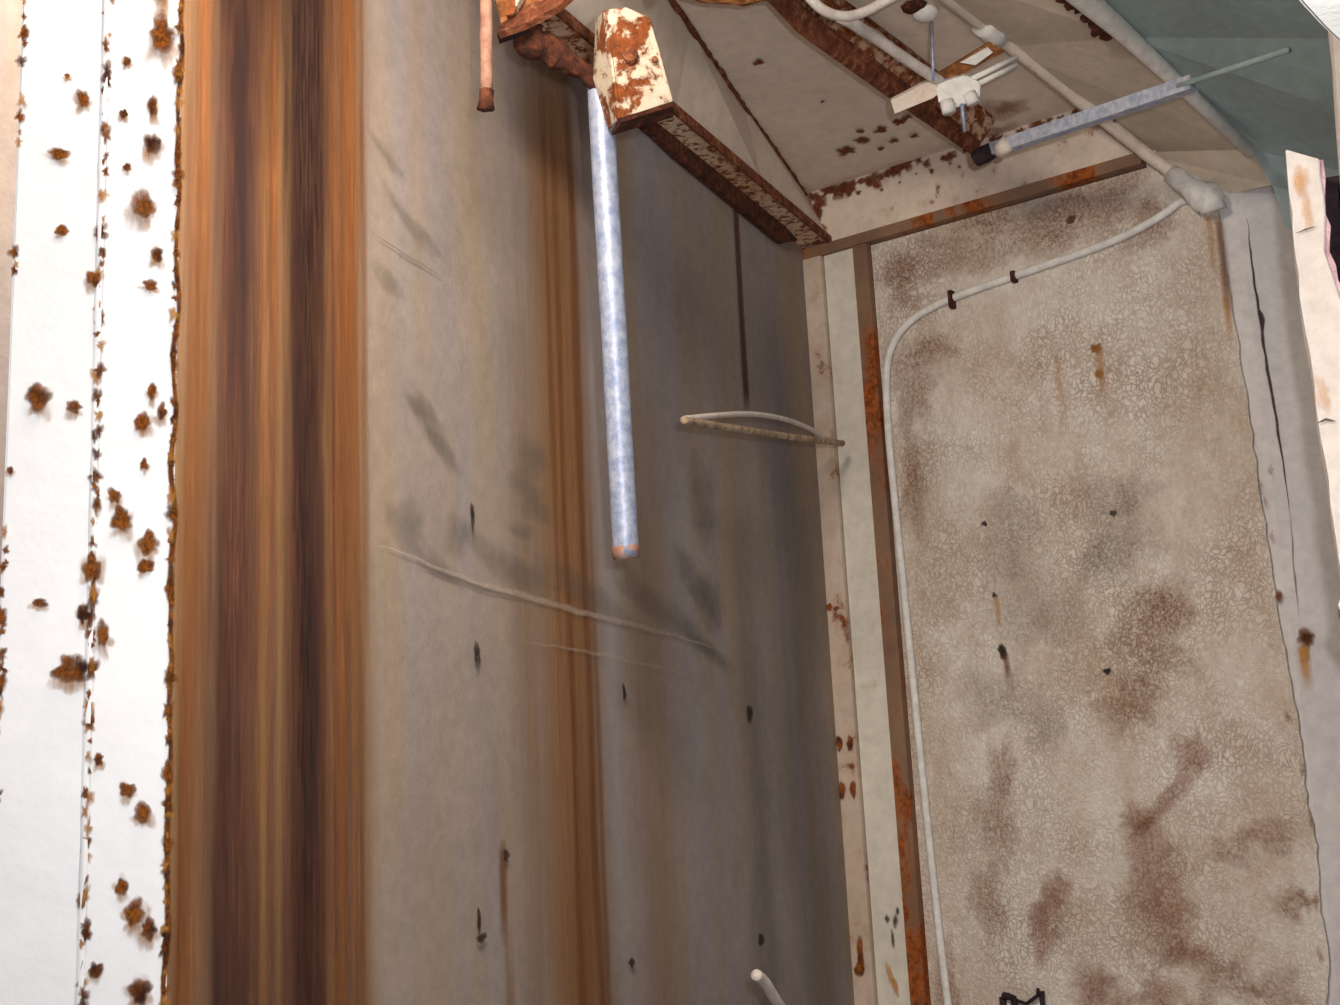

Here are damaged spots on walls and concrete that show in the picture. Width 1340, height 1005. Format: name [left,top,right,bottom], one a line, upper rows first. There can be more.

rust [15,0,29,67]
rust [14,95,25,147]
rust [836,115,919,156]
rust [989,109,1078,142]
rust [808,150,967,229]
rust [7,245,18,276]
rust [26,383,52,411]
rust [48,0,366,1005]
rust [0,527,9,715]
rust [32,598,48,609]
rust [1297,628,1314,677]
rust [854,938,864,976]